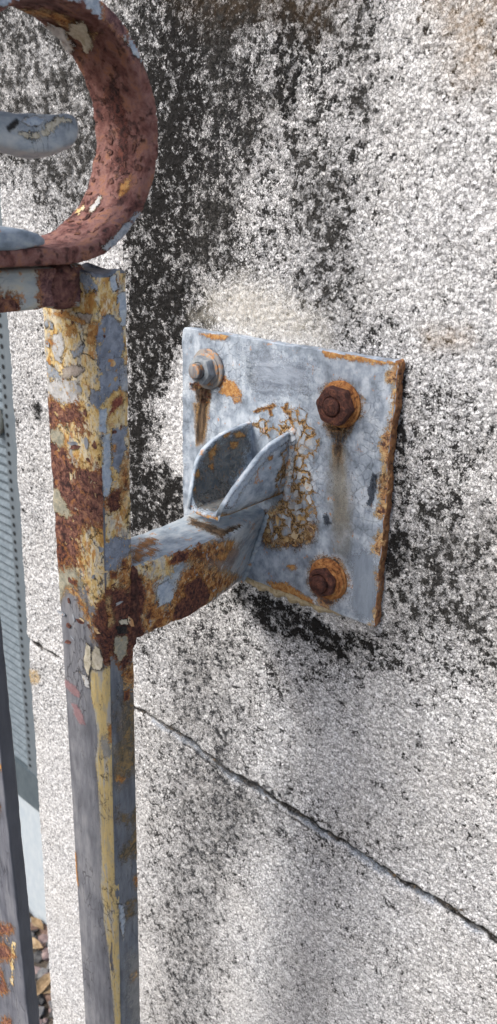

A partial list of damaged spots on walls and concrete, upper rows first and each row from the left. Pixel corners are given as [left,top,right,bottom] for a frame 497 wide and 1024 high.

water stain [0,6,97,224]
corrosion [65,59,144,235]
corrosion [199,333,227,341]
water stain [123,0,386,536]
peeling [43,270,176,634]
corrosion [317,350,402,591]
crack [32,640,59,657]
corrosion [48,376,290,784]
corrosion [266,552,353,610]
corrosion [114,807,137,861]
crack [134,706,497,944]
corrosion [126,953,140,1024]